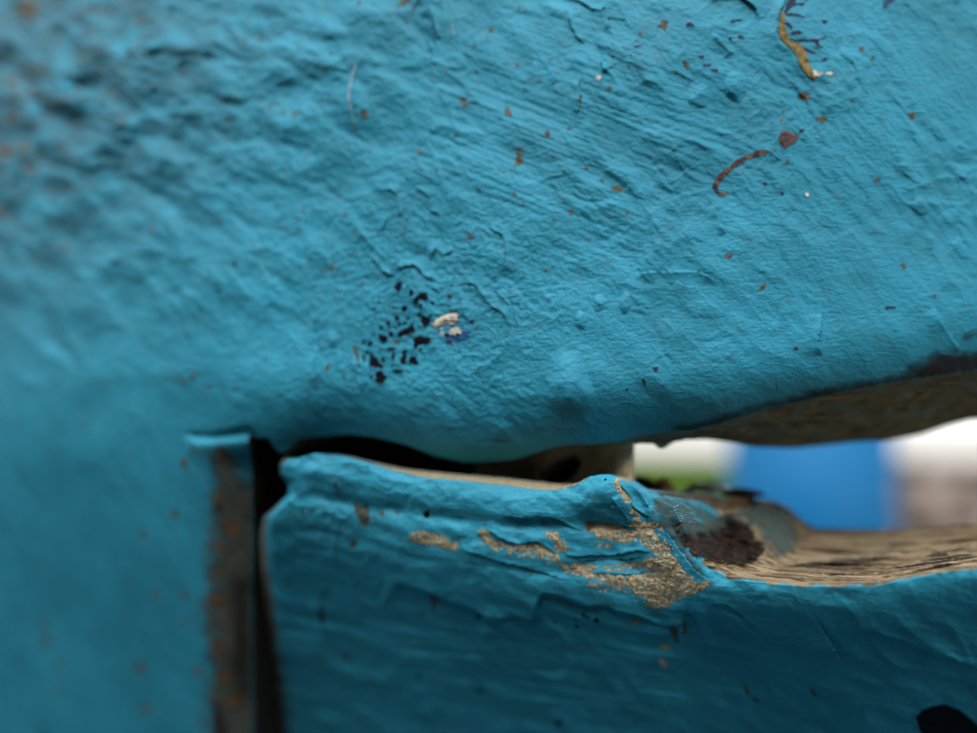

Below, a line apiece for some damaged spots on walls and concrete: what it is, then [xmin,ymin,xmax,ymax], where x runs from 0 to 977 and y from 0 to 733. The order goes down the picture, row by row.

peeling [352,180,526,392]
corrosion [201,449,287,733]
peeling [285,498,370,534]
peeling [328,455,771,637]